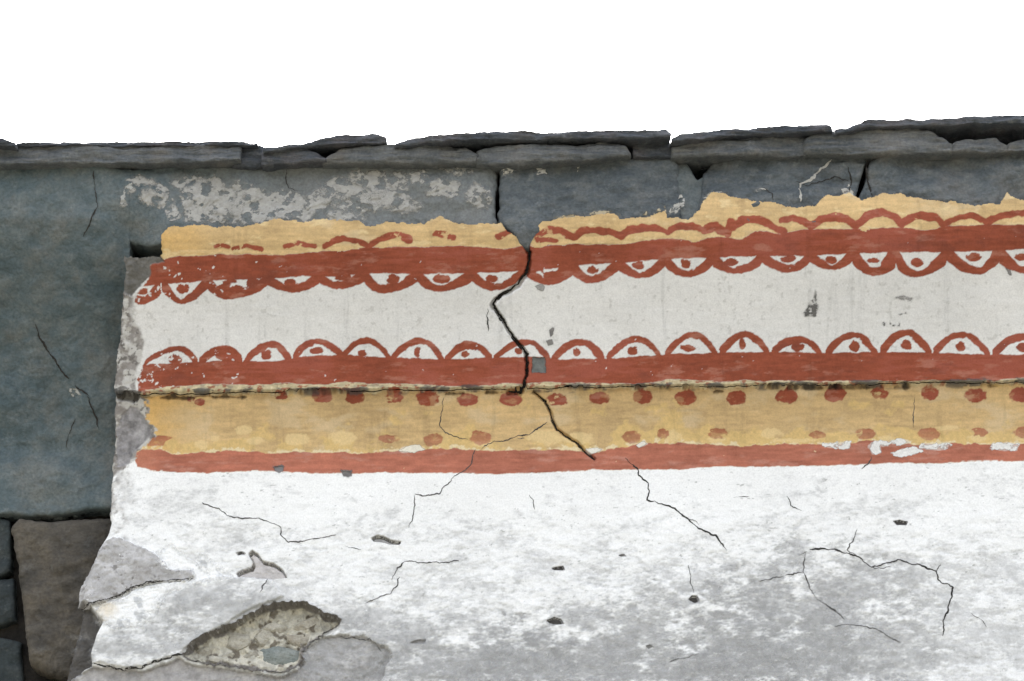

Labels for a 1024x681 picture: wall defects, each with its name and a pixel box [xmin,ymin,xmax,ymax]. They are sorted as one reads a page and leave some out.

peeling [120,167,492,225]
crack [796,159,873,201]
crack [35,324,99,446]
crack [409,251,595,525]
peeling [822,441,851,450]
peeling [870,438,952,457]
peeling [991,442,1020,451]
crack [203,503,361,550]
crack [627,459,726,549]
flaking render [78,537,286,627]
crack [760,530,986,643]
spalling [182,600,341,673]